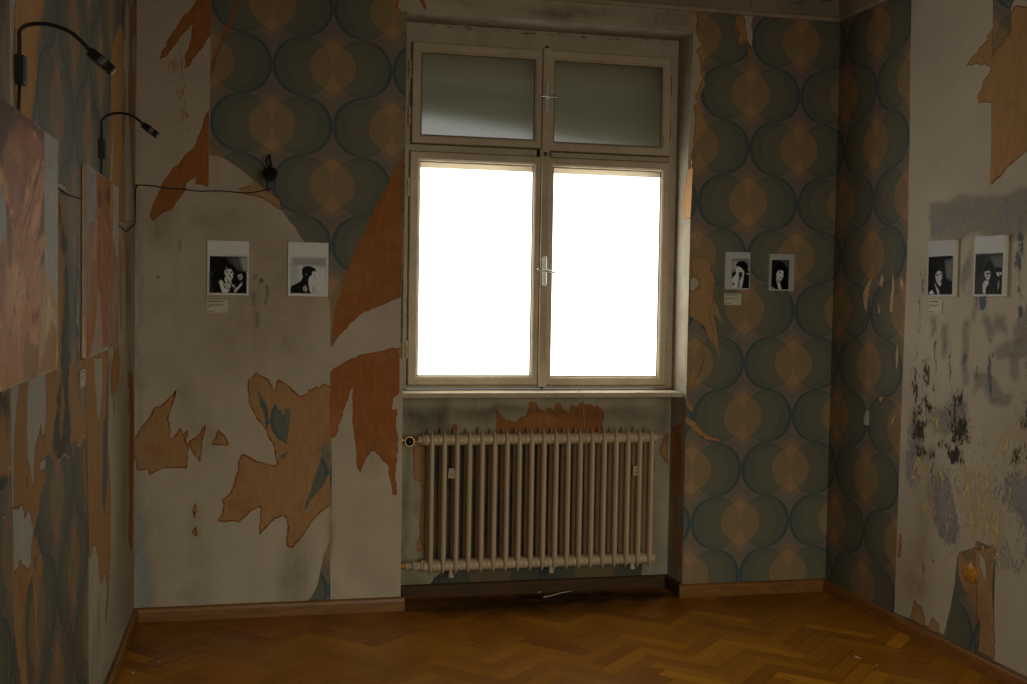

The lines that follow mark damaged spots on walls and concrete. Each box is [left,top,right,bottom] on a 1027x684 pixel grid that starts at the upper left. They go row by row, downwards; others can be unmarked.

peeling [160,0,211,69]
peeling [966,6,1027,185]
peeling [150,110,209,221]
peeling [134,390,229,475]
peeling [217,348,400,548]